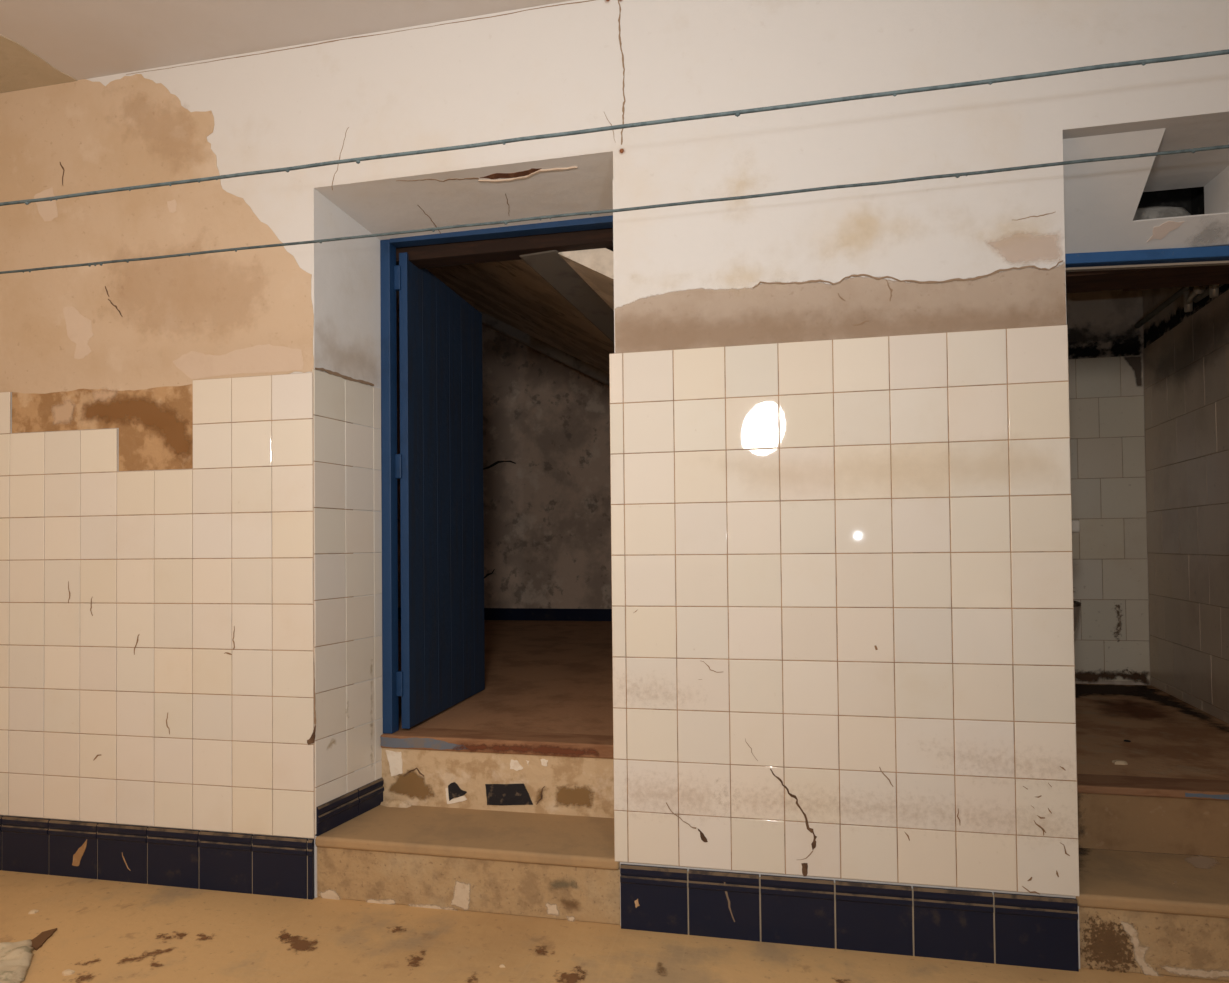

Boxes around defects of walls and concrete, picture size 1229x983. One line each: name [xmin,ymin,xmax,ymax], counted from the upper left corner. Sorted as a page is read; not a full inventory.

crack [126,0,626,145]
flaking render [396,166,577,182]
flaking render [0,35,314,471]
flaking render [615,212,1066,353]
water stain [1068,284,1229,386]
flaking render [380,737,467,804]
flaking render [485,759,593,807]
crack [666,802,708,842]
crack [745,739,817,876]